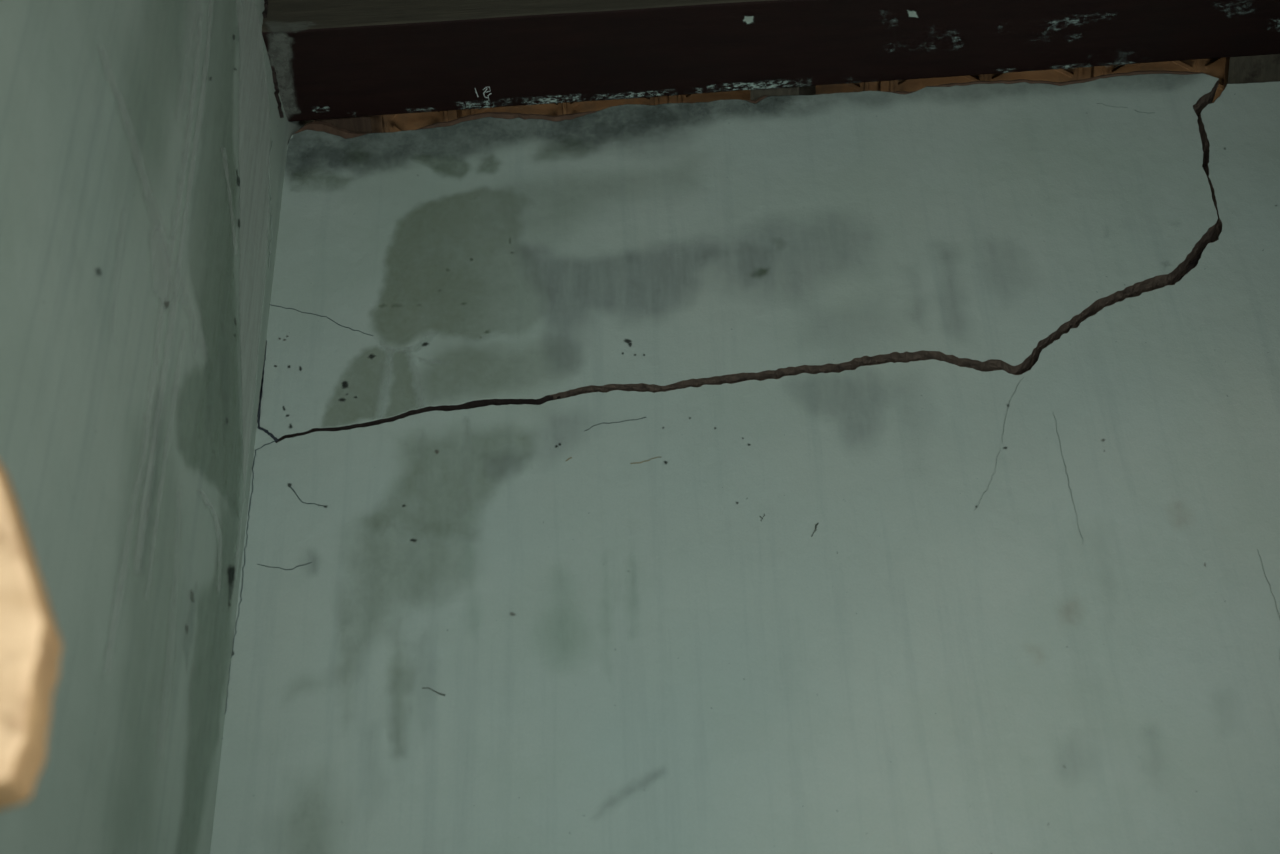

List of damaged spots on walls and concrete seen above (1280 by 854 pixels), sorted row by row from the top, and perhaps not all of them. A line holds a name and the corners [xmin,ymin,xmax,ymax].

crack [225,80,1227,713]